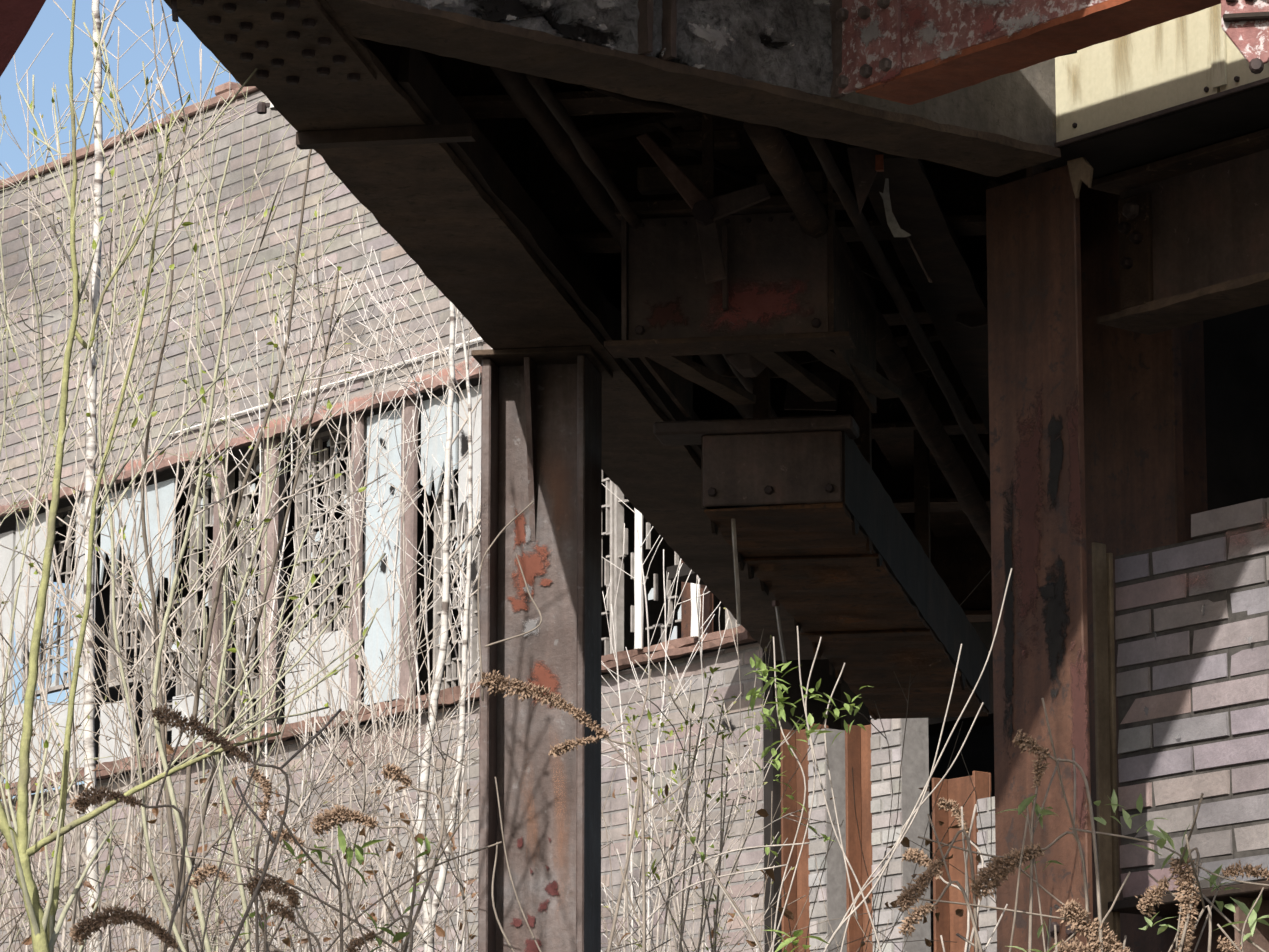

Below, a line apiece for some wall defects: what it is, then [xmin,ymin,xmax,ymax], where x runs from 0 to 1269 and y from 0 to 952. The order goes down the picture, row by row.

peeling [998,10,1046,36]
rust [526,663,561,705]